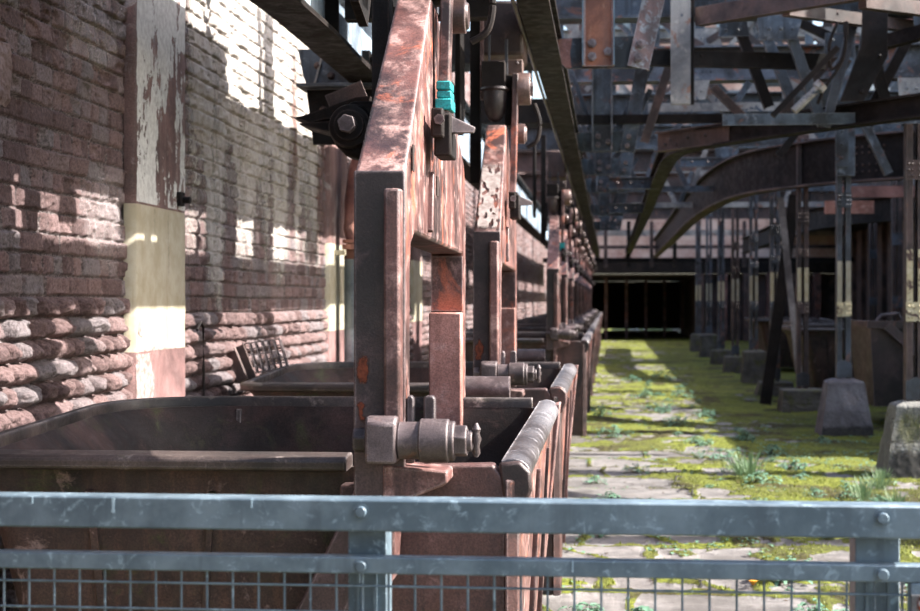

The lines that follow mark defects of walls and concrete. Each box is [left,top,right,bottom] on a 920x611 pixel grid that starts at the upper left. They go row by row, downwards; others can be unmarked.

peeling [136,0,185,211]